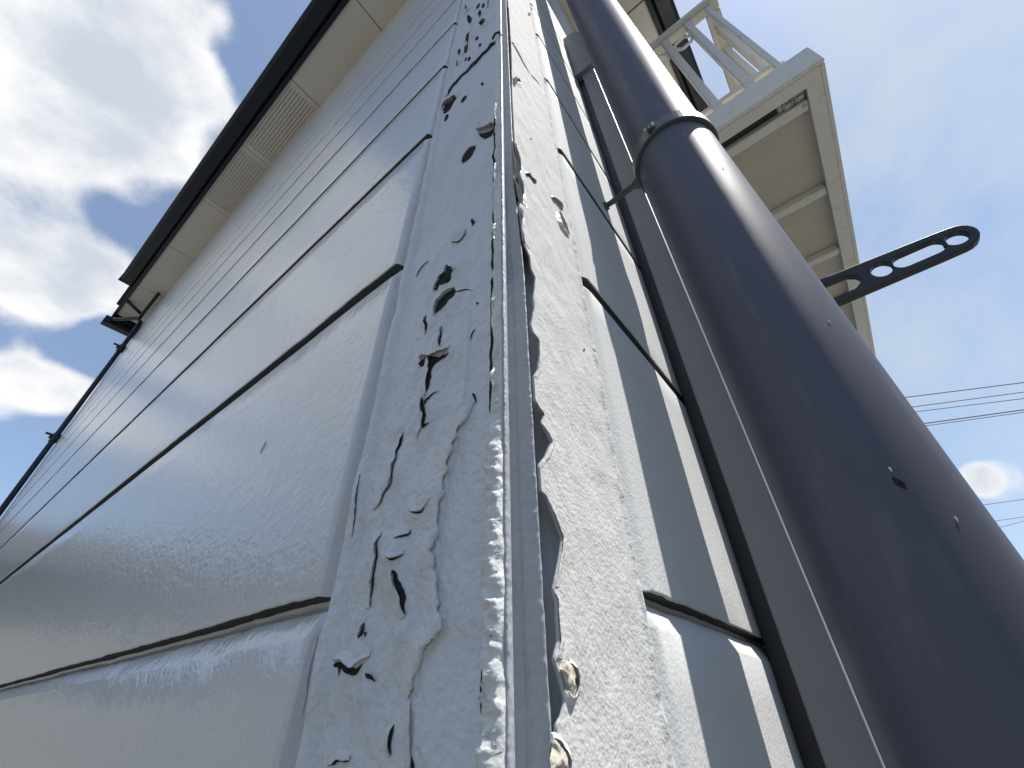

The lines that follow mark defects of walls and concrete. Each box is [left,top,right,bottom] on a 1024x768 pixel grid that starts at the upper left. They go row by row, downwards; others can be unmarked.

peeling [456,0,494,67]
peeling [438,90,467,121]
peeling [460,122,494,163]
peeling [512,140,528,245]
peeling [550,195,570,238]
peeling [432,262,478,315]
peeling [536,401,555,469]
peeling [402,403,474,768]
spalling [548,497,580,707]
peeling [333,650,375,682]
spalling [550,732,572,768]